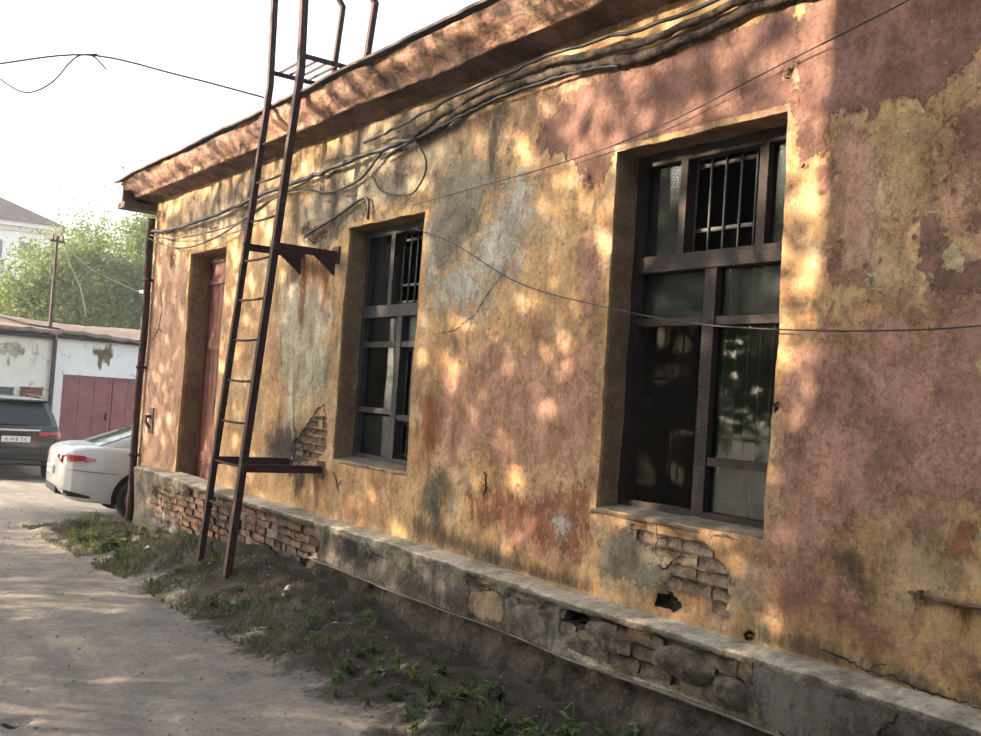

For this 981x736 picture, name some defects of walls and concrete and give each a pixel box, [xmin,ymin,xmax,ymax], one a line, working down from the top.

peeling [424,141,545,322]
peeling [0,342,25,365]
peeling [139,244,188,470]
peeling [275,275,339,464]
crack [440,271,505,342]
peeling [422,226,736,618]
peeling [536,0,981,655]
spalling [150,483,326,561]
leakage [413,470,589,589]
spalling [476,584,764,719]
crack [877,713,899,736]
crack [817,647,981,710]